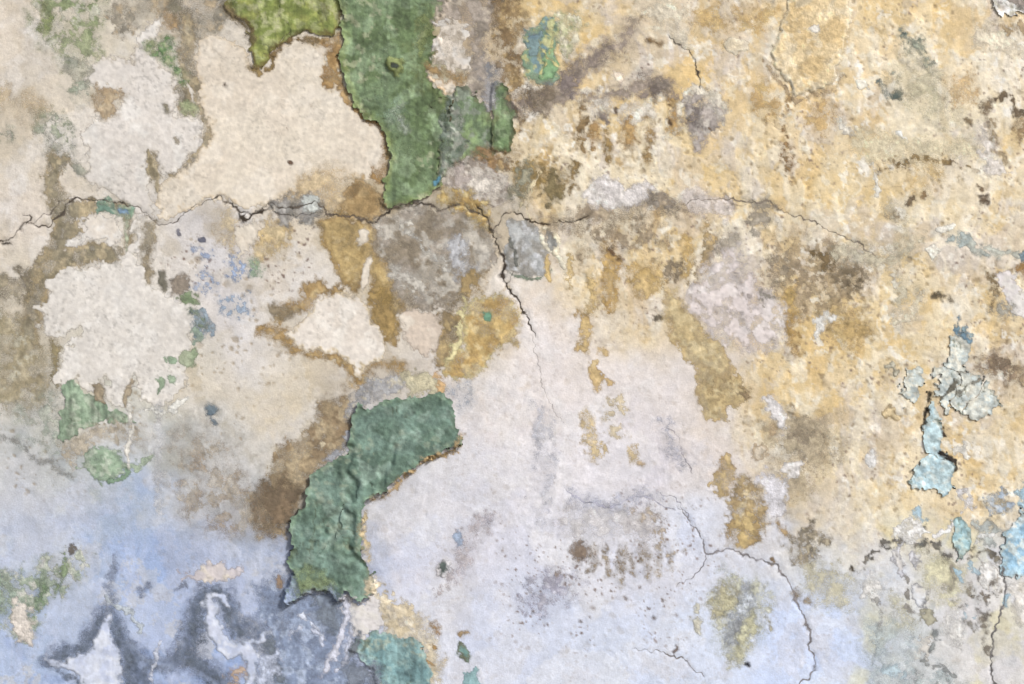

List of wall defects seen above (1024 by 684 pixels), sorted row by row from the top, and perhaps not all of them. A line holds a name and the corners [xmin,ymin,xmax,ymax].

peeling [32,0,471,408]
crack [0,170,587,418]
crack [683,197,876,257]
peeling [898,335,1003,497]
peeling [285,391,463,640]
crack [566,490,816,684]
crack [863,526,1007,684]